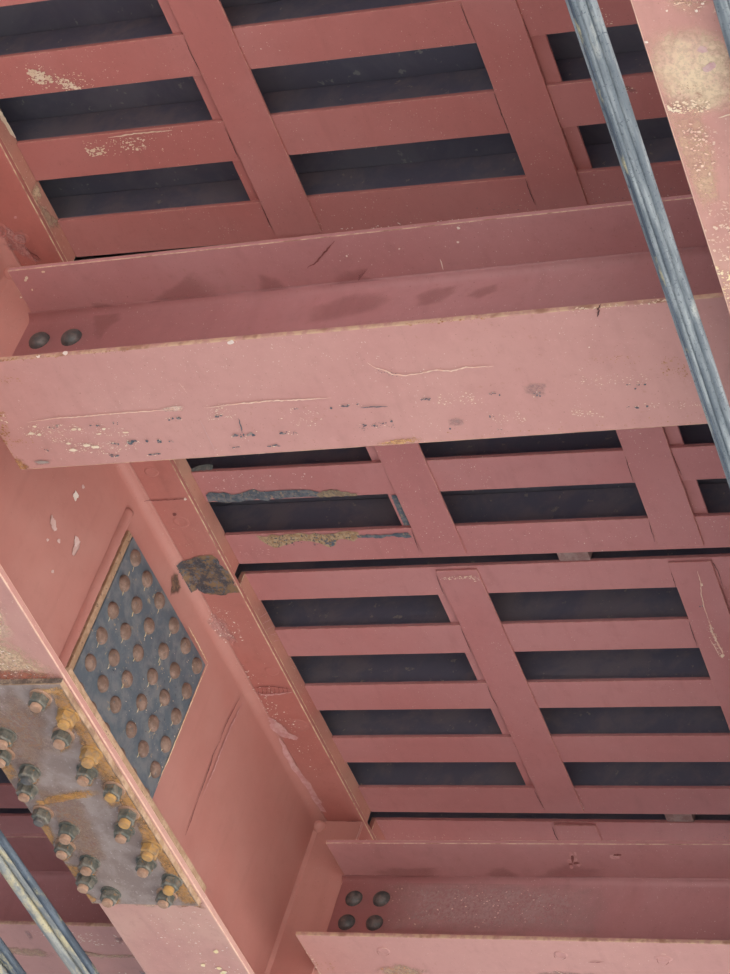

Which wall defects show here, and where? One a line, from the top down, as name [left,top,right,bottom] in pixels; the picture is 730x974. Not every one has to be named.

peeling [18,422,170,464]
peeling [206,474,357,503]
peeling [238,495,411,555]
peeling [171,555,239,596]
corrosion [0,675,201,908]